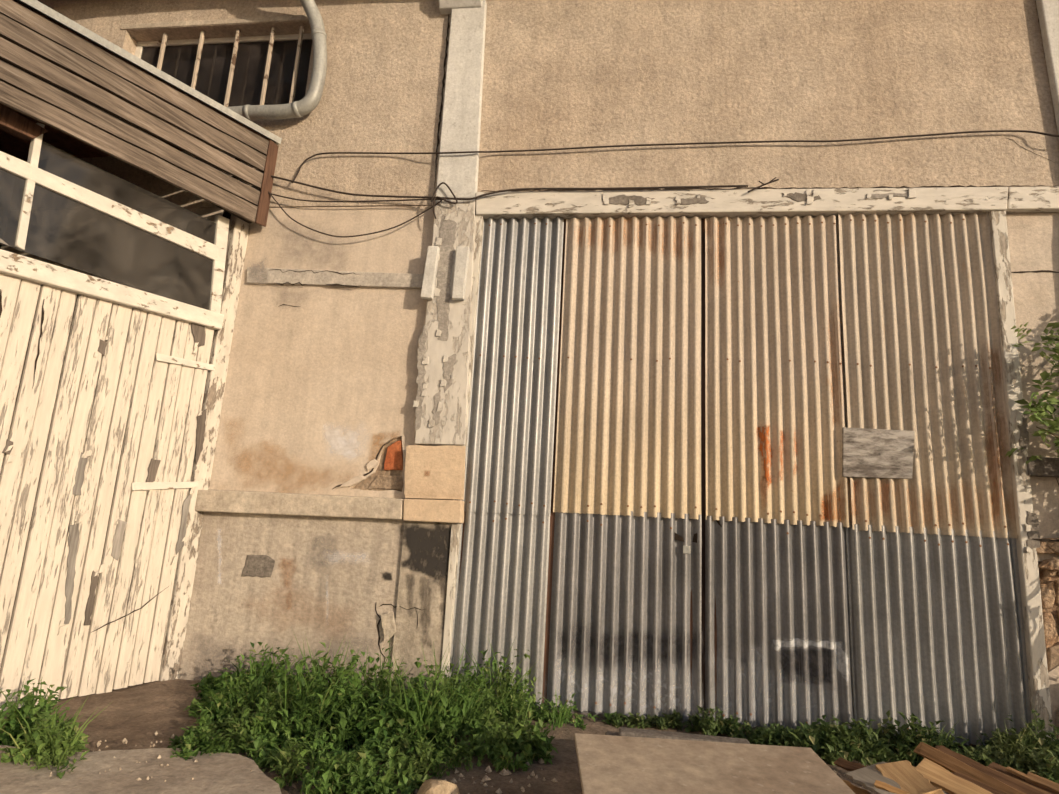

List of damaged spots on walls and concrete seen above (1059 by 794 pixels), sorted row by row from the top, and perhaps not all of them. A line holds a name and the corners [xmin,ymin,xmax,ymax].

peeling [191,323,208,353]
peeling [412,214,457,430]
peeling [73,450,93,495]
peeling [146,458,161,494]
peeling [195,409,207,471]
flaking render [338,437,403,492]
rust [757,426,796,485]
peeling [58,513,84,635]
peeling [84,519,127,626]
damp [401,522,451,646]
flaking render [1024,511,1059,671]
crack [375,604,424,670]